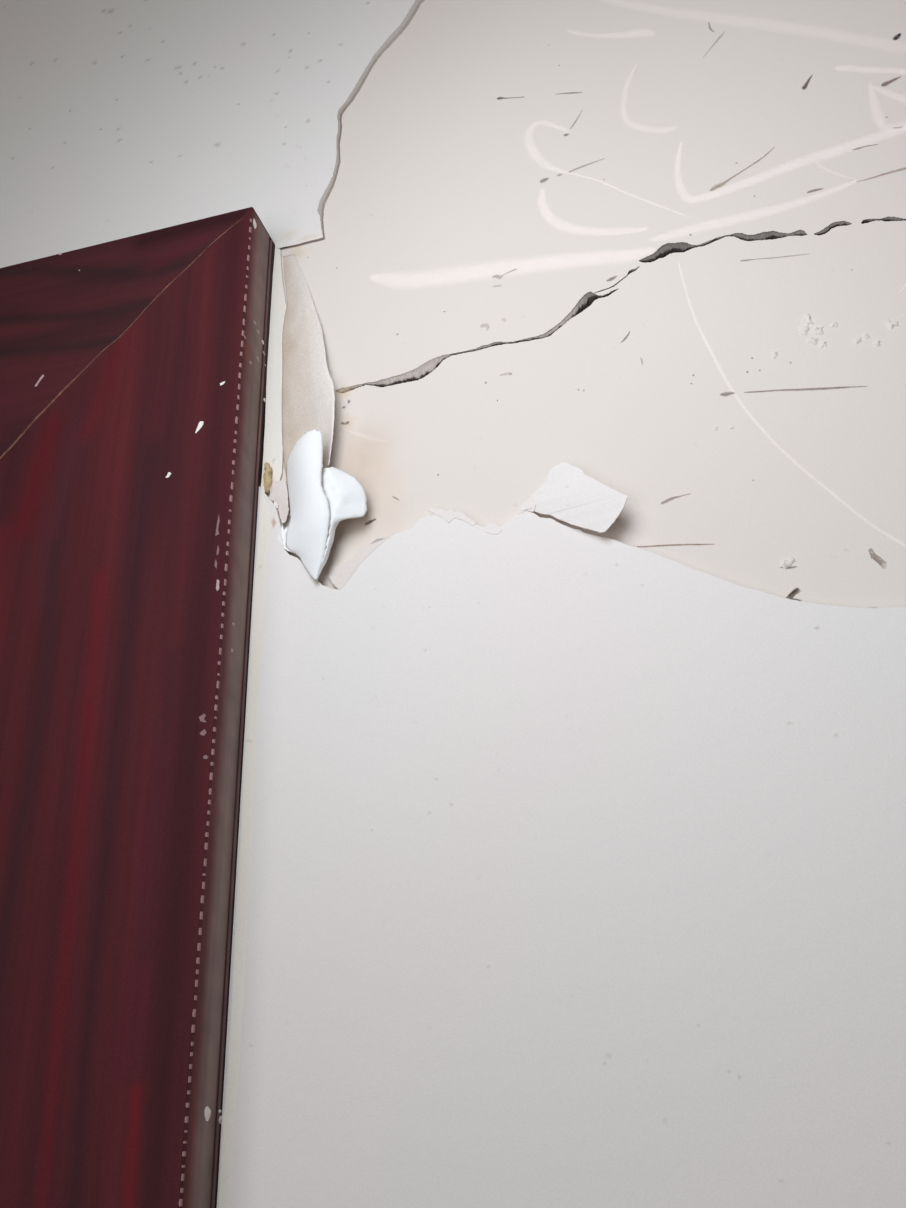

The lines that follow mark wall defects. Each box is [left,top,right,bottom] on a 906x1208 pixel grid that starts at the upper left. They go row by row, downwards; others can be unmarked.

peeling [267,0,906,608]
crack [336,217,906,393]